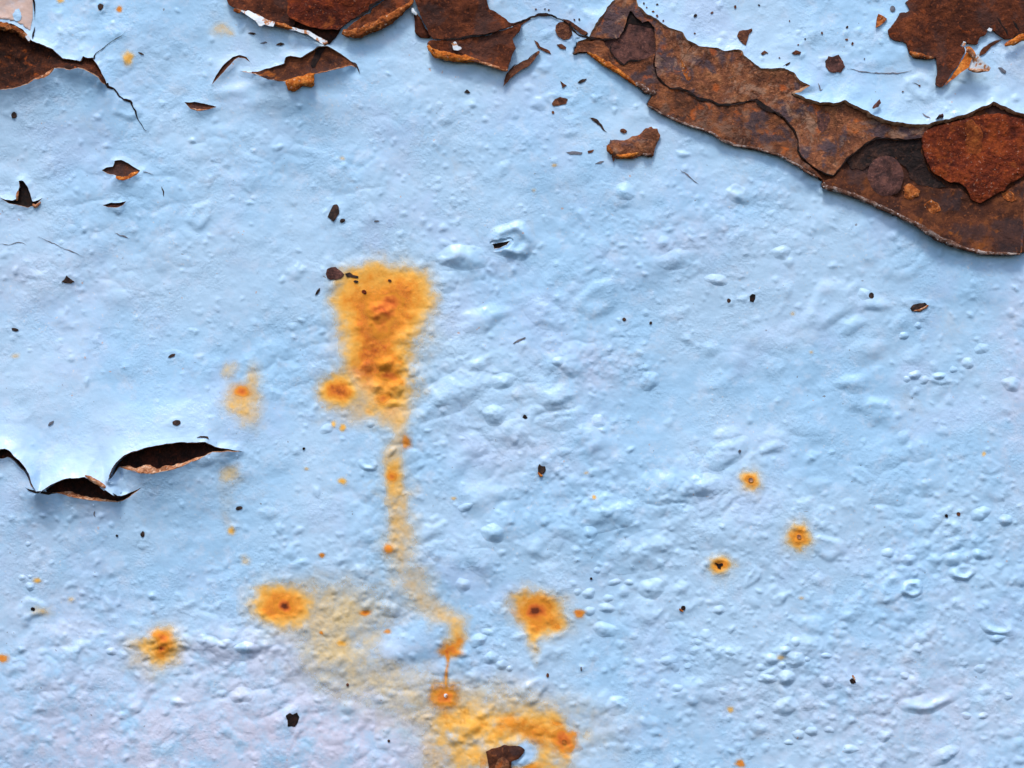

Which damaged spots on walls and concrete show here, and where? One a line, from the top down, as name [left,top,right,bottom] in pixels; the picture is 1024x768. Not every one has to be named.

peeling [876,6,895,28]
peeling [0,0,112,95]
peeling [737,29,752,45]
peeling [825,55,845,73]
rust [227,374,259,421]
rust [739,472,760,491]
rust [318,261,585,768]
rust [786,524,812,552]
rust [709,556,731,574]
rust [248,582,315,631]
rust [132,626,182,668]